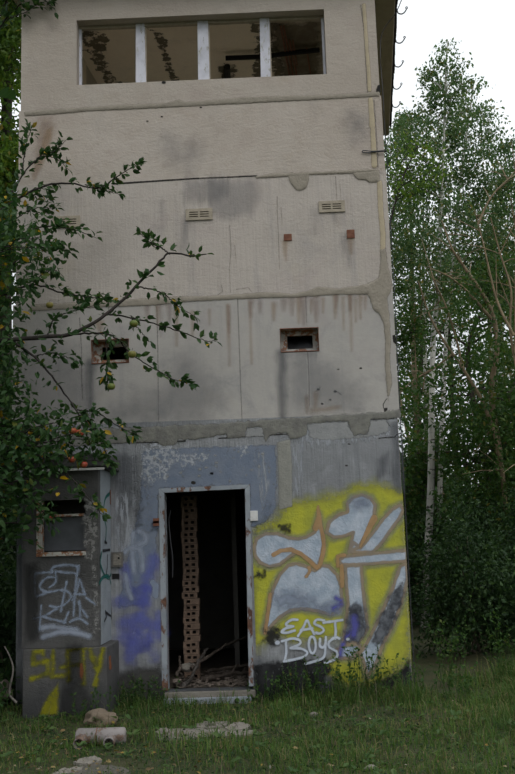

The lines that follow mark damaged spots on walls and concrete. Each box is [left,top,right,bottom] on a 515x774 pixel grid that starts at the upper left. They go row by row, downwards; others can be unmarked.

peeling [115,427,278,608]
flaking render [292,408,390,493]